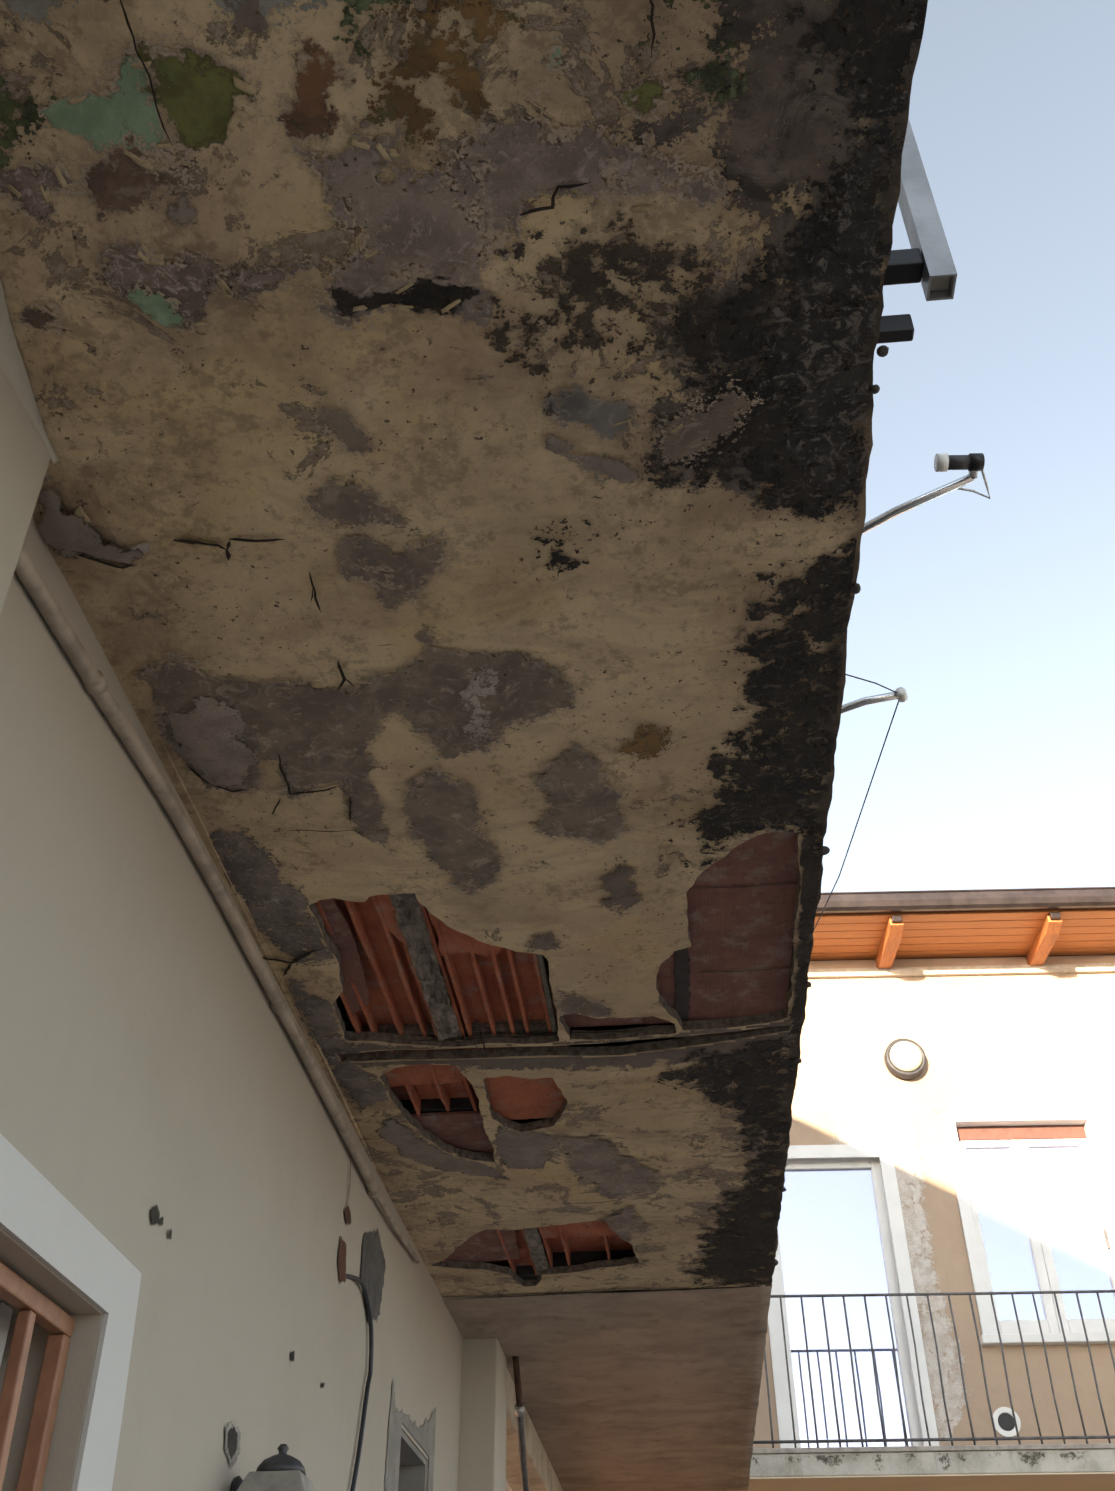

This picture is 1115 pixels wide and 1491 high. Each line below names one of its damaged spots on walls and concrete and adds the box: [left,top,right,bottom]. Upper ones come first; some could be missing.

crack [120,0,173,147]
crack [520,182,590,216]
peeling [0,31,765,484]
flaking render [37,477,150,565]
crack [174,538,285,566]
crack [309,572,321,612]
crack [337,661,354,691]
damp [334,0,927,1287]
crack [189,755,374,843]
spalling [210,830,799,1180]
spalling [442,1219,636,1278]
peeling [385,1381,436,1491]